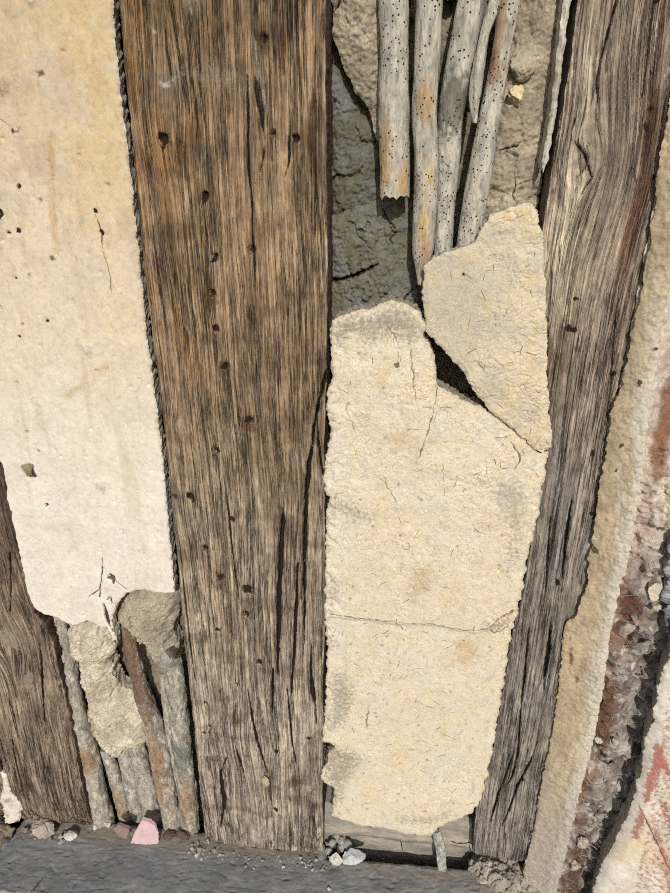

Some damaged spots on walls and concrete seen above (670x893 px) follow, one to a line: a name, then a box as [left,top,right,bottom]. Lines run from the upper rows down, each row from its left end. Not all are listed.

crack [220,368,328,826]
crack [332,610,551,826]